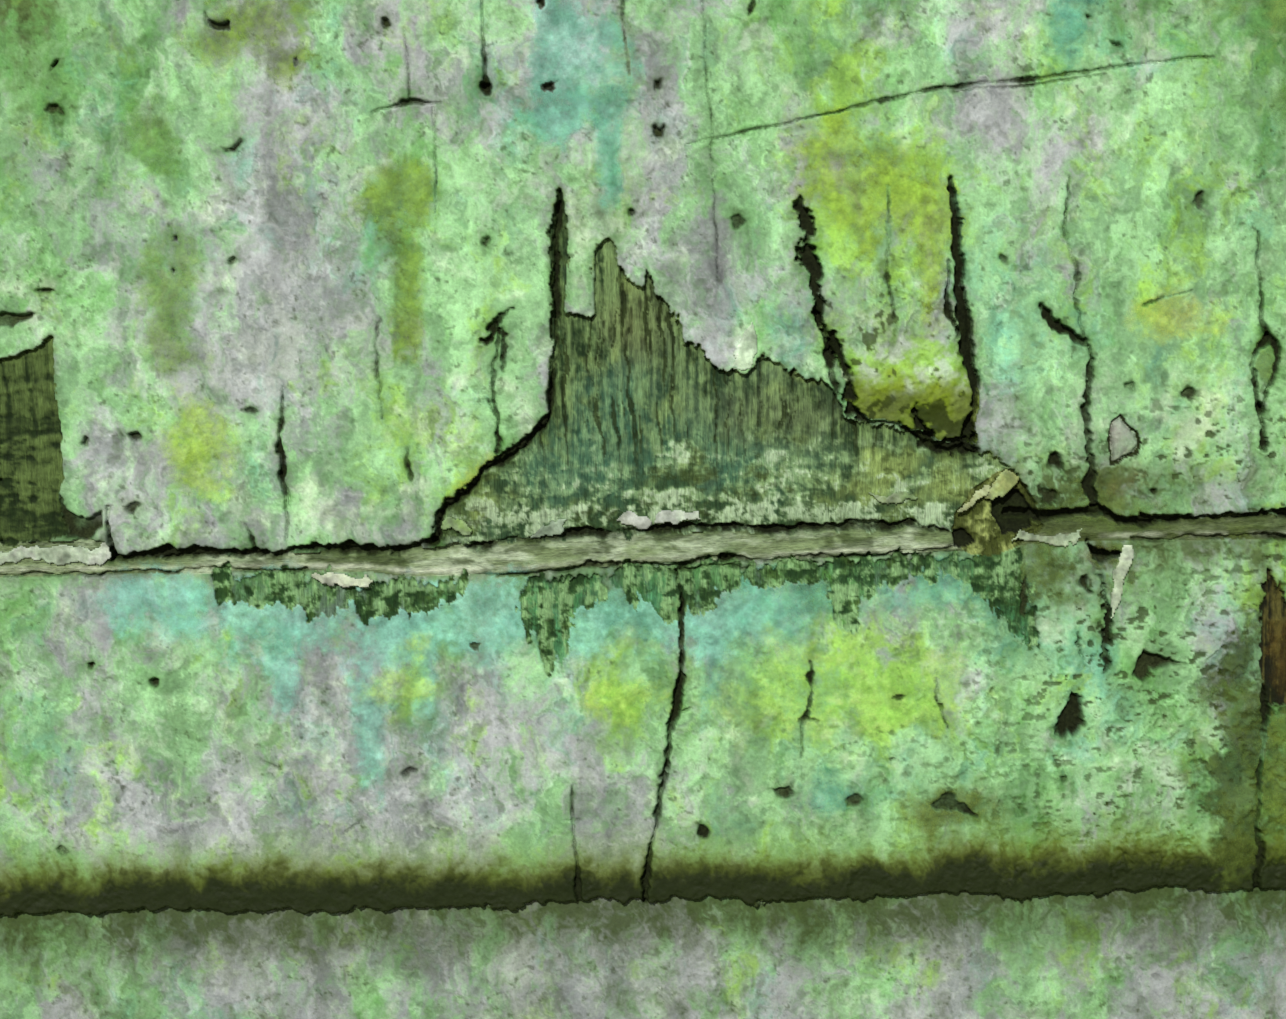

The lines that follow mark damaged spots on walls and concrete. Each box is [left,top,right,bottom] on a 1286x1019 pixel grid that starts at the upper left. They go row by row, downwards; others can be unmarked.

crack [686,0,1213,281]
peeling [0,336,111,566]
crack [3,387,436,578]
peeling [212,561,469,626]
crack [467,518,953,902]
peeling [431,190,1134,676]
crack [793,176,980,457]
crack [1001,177,1286,673]
crack [1252,686,1270,887]
peeling [1258,569,1286,705]